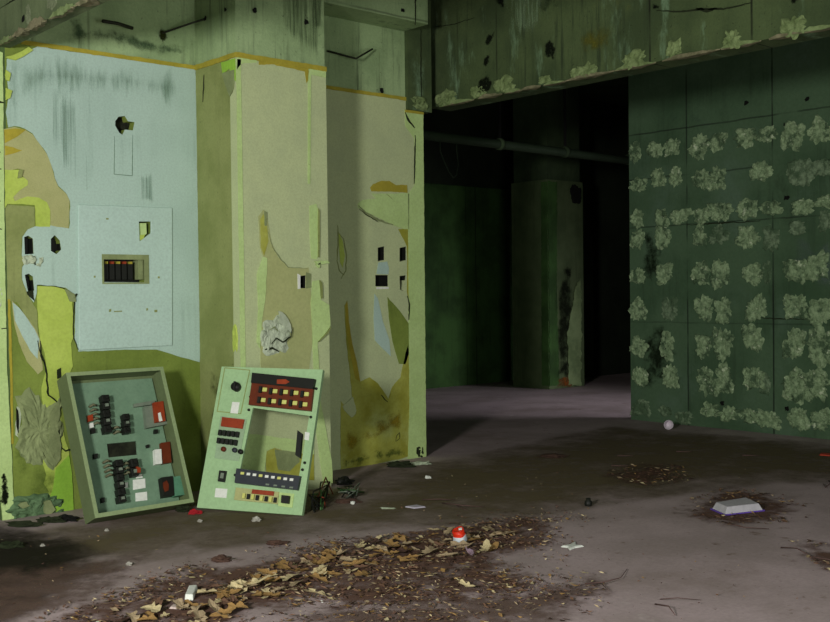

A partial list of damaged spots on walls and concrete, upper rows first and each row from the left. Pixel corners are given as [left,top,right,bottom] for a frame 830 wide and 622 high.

spalling [0,0,100,45]
peeling [221,57,326,184]
leakage [478,77,492,92]
leakage [545,41,555,59]
crack [656,2,751,13]
peeling [0,47,200,519]
peeling [257,204,331,369]
peeling [241,287,424,484]
peeling [358,181,409,298]
leakage [559,269,572,376]
leakage [645,236,656,273]
leakage [647,330,667,383]